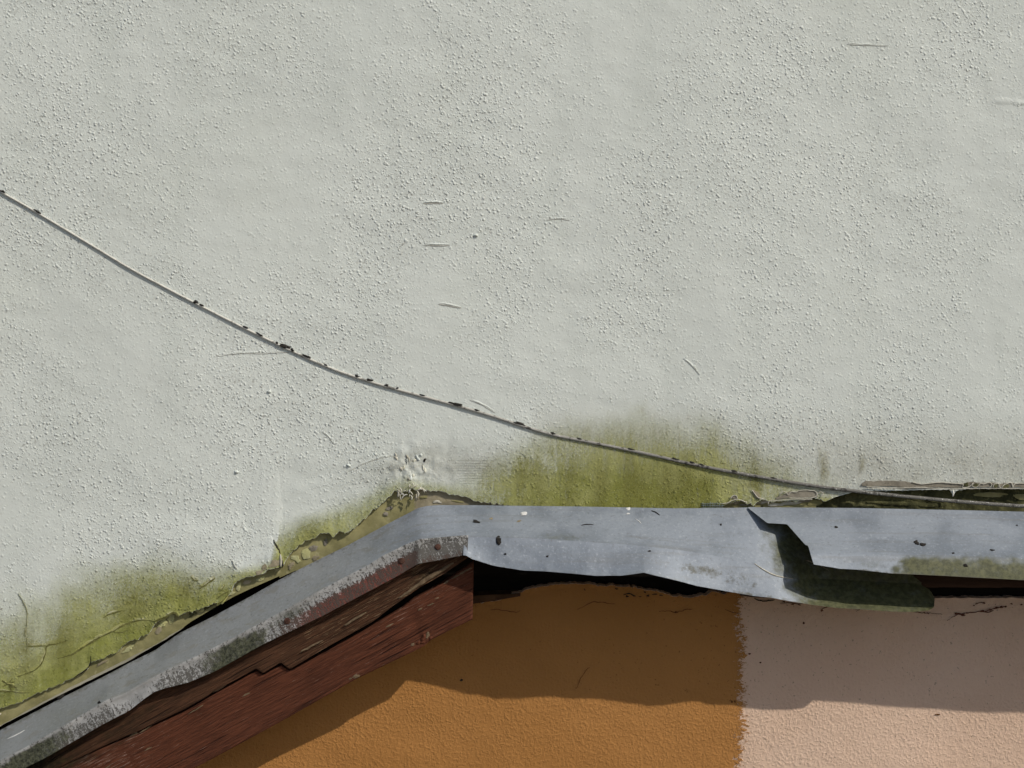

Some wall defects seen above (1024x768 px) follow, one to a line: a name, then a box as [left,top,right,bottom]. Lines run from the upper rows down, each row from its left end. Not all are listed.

spalling [722,480,1024,512]
crack [191,560,237,606]
crack [0,593,179,693]